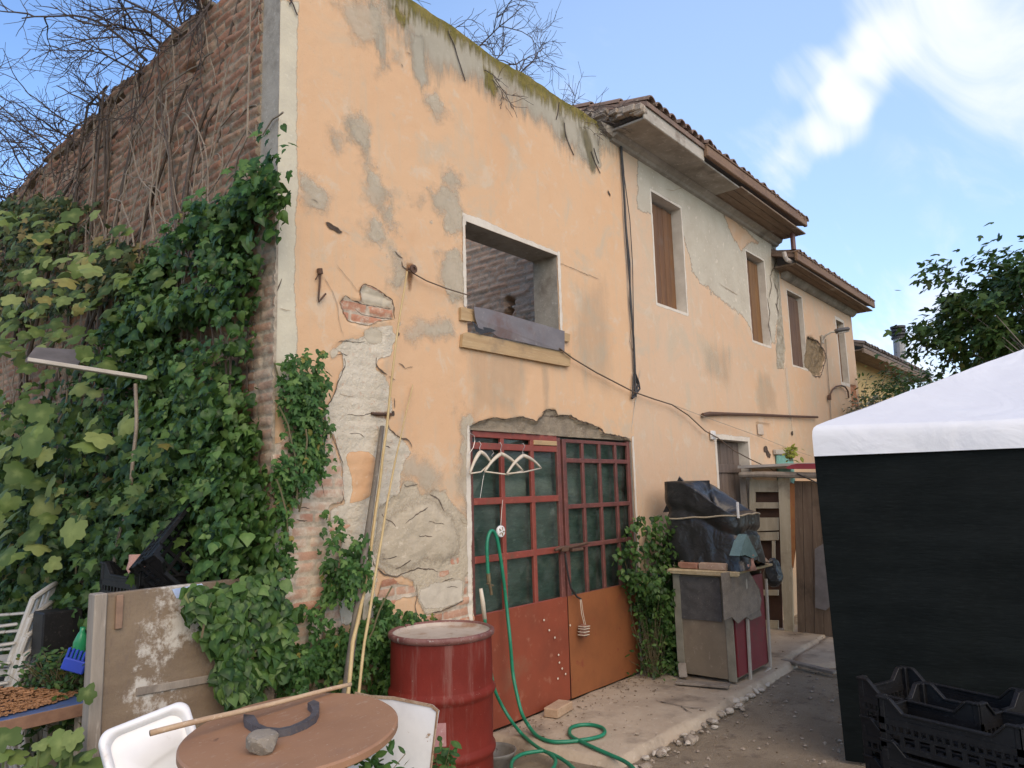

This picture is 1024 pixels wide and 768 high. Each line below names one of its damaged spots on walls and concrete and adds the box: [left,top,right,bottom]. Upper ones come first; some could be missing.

leakage [370,0,617,168]
flaking render [767,244,785,369]
flaking render [272,166,475,649]